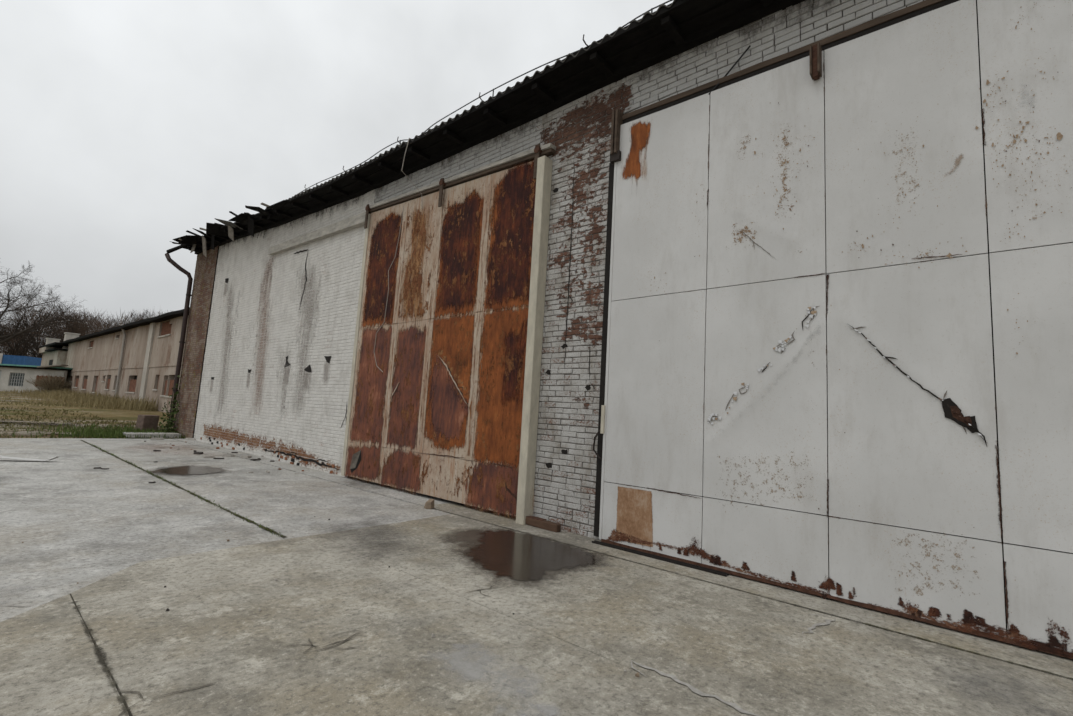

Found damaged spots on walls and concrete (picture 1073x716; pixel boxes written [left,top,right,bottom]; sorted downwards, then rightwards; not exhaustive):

rust [623,122,651,179]
rust [345,161,547,521]
crack [848,324,987,446]
spalling [200,424,340,474]
rust [608,485,856,604]
rust [869,561,1073,658]